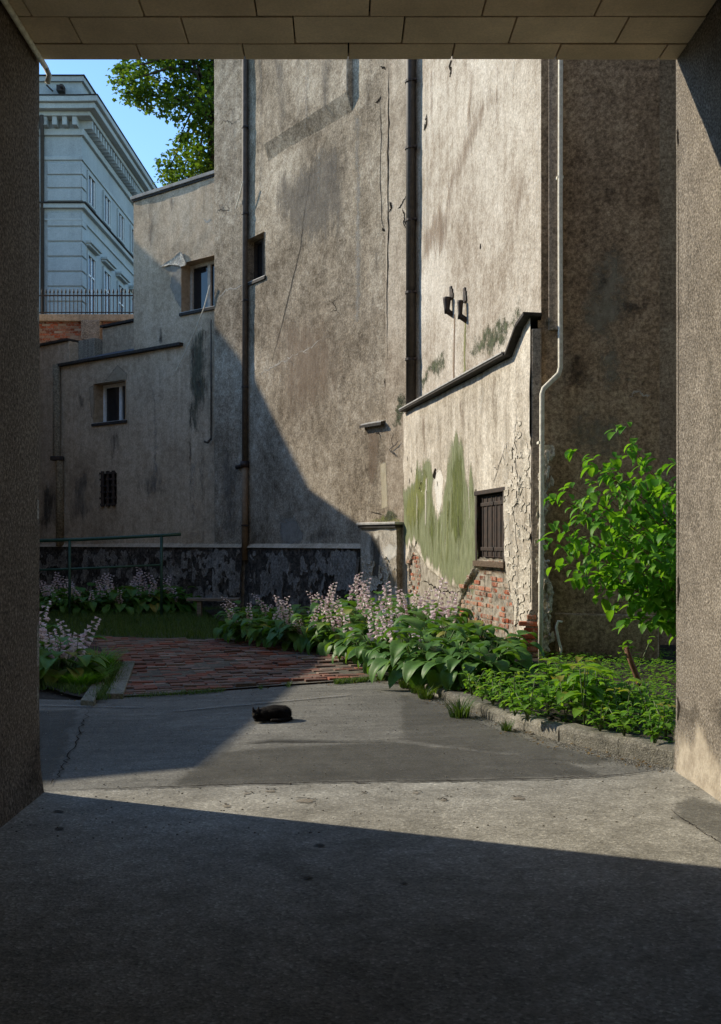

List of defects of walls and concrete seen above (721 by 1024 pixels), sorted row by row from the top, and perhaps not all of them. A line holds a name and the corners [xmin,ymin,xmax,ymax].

crack [375,66,406,315]
water stain [190,331,207,429]
peeling [39,421,555,658]
water stain [406,448,473,547]
crack [51,715,89,783]